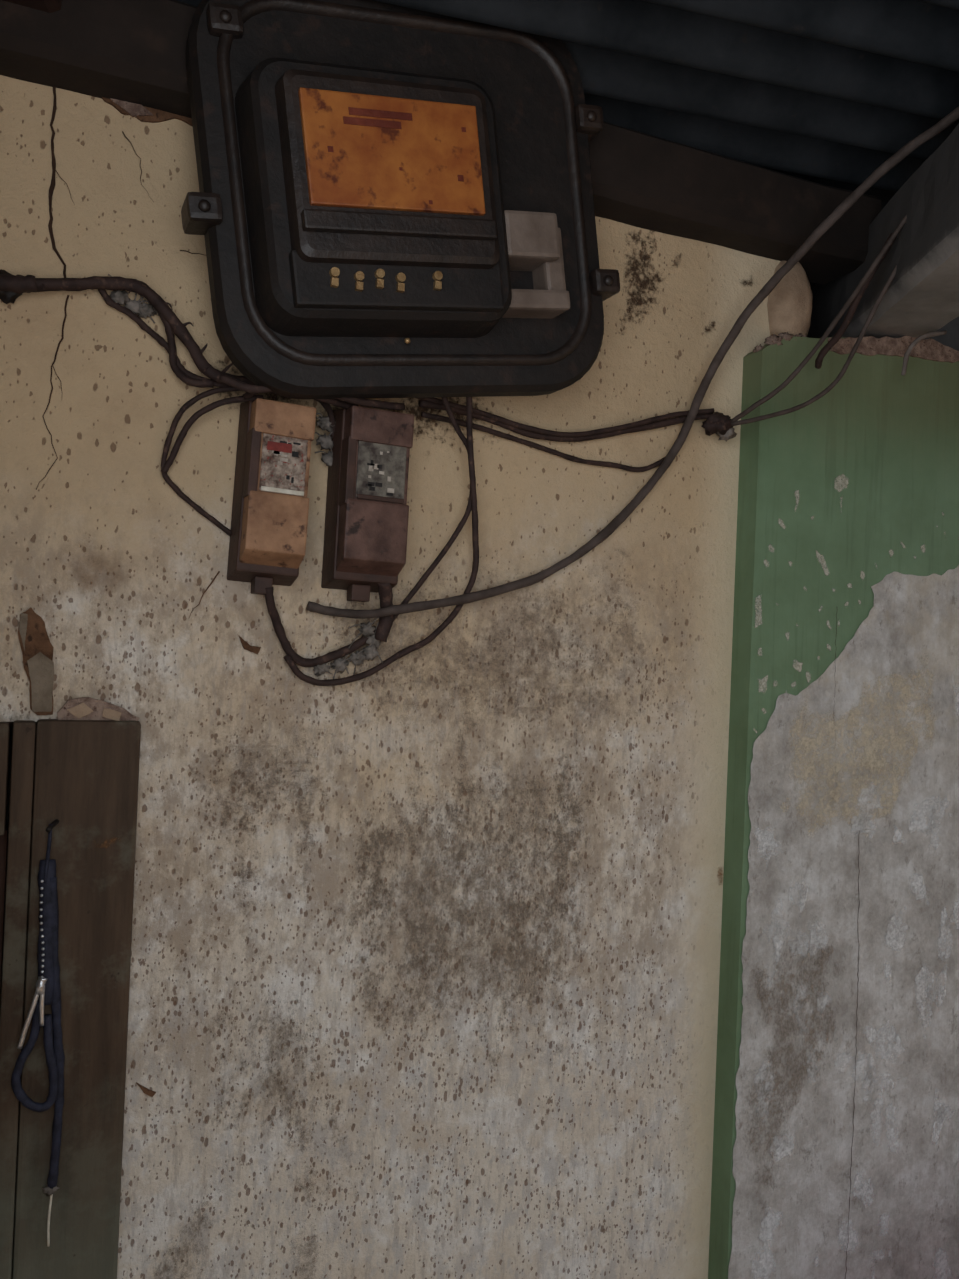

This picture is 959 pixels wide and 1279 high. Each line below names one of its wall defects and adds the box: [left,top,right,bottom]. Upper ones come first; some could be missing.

crack [36,86,75,490]
spalling [753,332,806,353]
spalling [828,336,959,363]
damp [349,765,589,1019]
peeling [728,551,959,1279]
damp [750,948,834,1185]